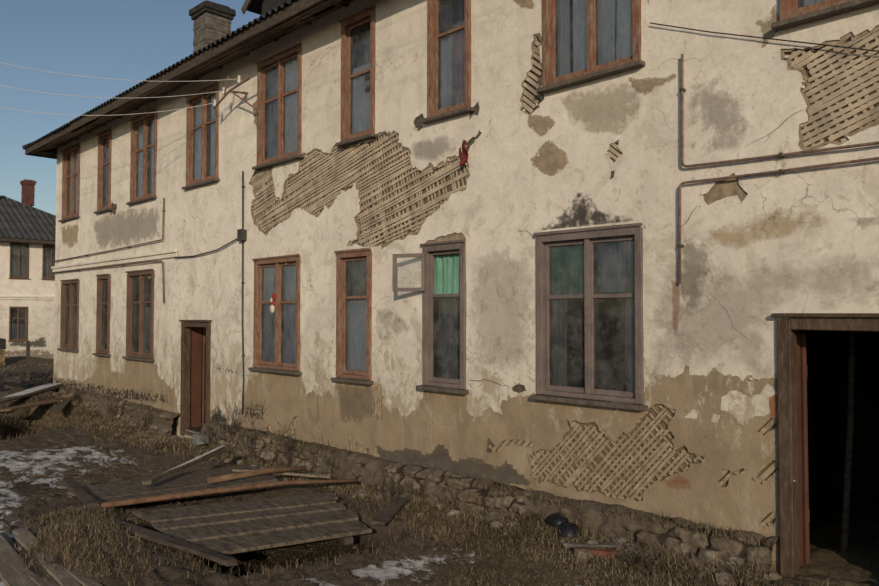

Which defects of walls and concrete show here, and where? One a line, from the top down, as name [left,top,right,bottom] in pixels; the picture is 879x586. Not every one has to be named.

peeling [513,0,534,8]
spalling [520,33,568,176]
peeling [629,74,676,93]
peeling [757,7,779,48]
spalling [781,25,879,151]
spalling [250,131,482,249]
spalling [700,174,748,205]
peeling [232,365,780,572]